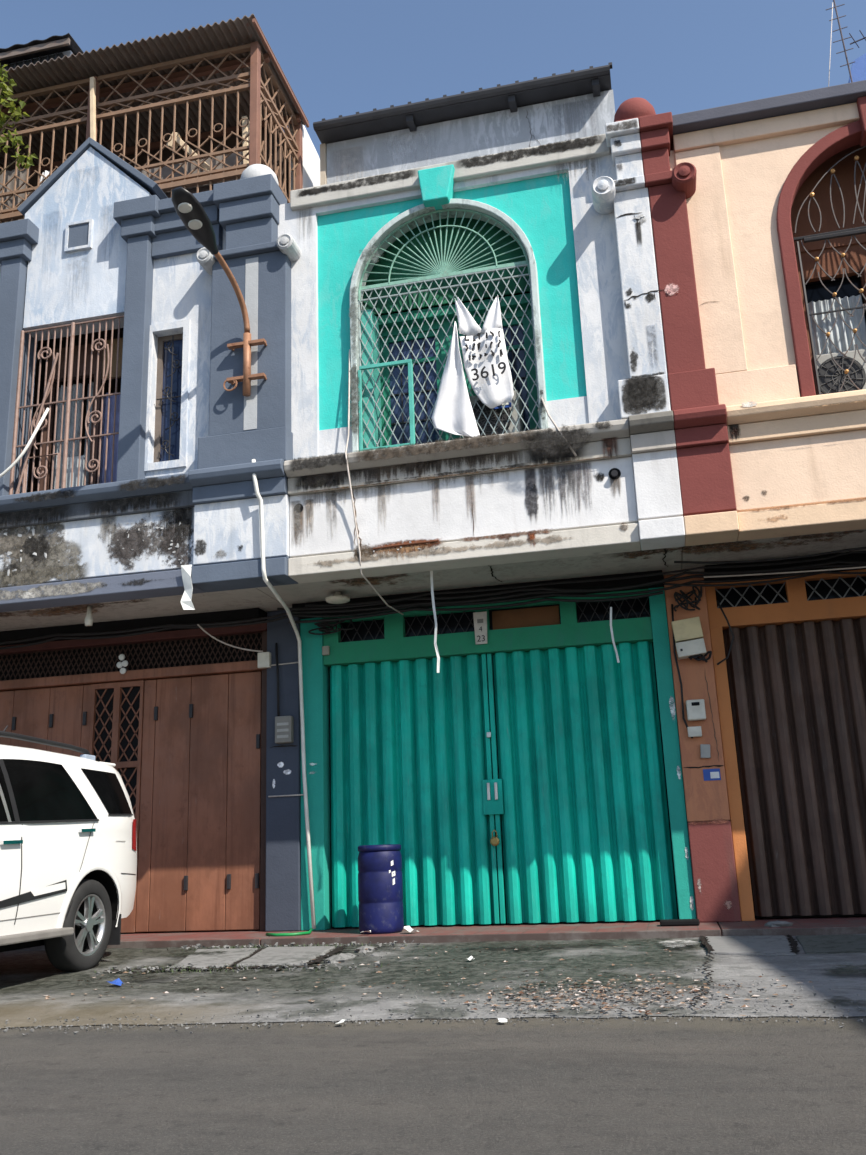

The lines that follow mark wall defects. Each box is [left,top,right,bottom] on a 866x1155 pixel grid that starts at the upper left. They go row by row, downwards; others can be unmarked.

water stain [460,120,637,173]
water stain [299,170,413,196]
water stain [614,164,635,187]
water stain [622,325,666,414]
water stain [291,390,617,535]
water stain [0,490,73,527]
water stain [90,474,225,570]
water stain [315,535,572,566]
corrosion [464,529,550,546]